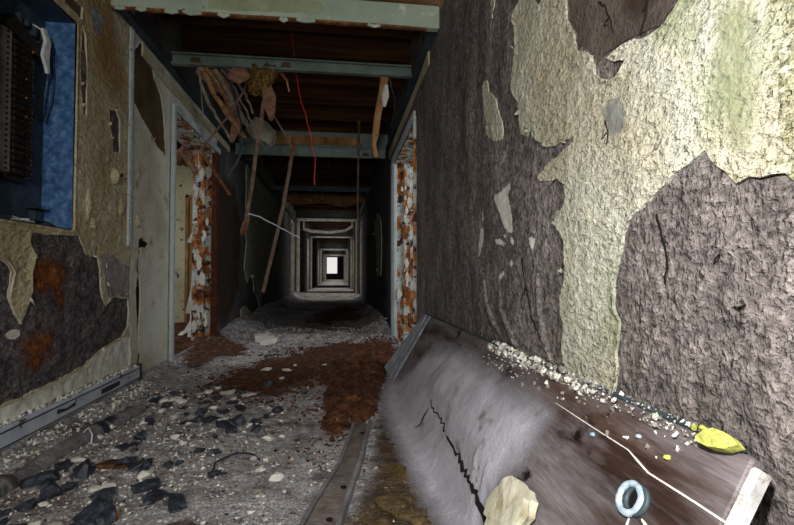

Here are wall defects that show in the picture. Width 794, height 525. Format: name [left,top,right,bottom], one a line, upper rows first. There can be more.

spalling [65,0,103,115]
peeling [109,109,119,152]
rust [33,259,66,310]
spalling [0,230,131,424]
rust [210,152,219,336]
peeling [510,0,794,525]